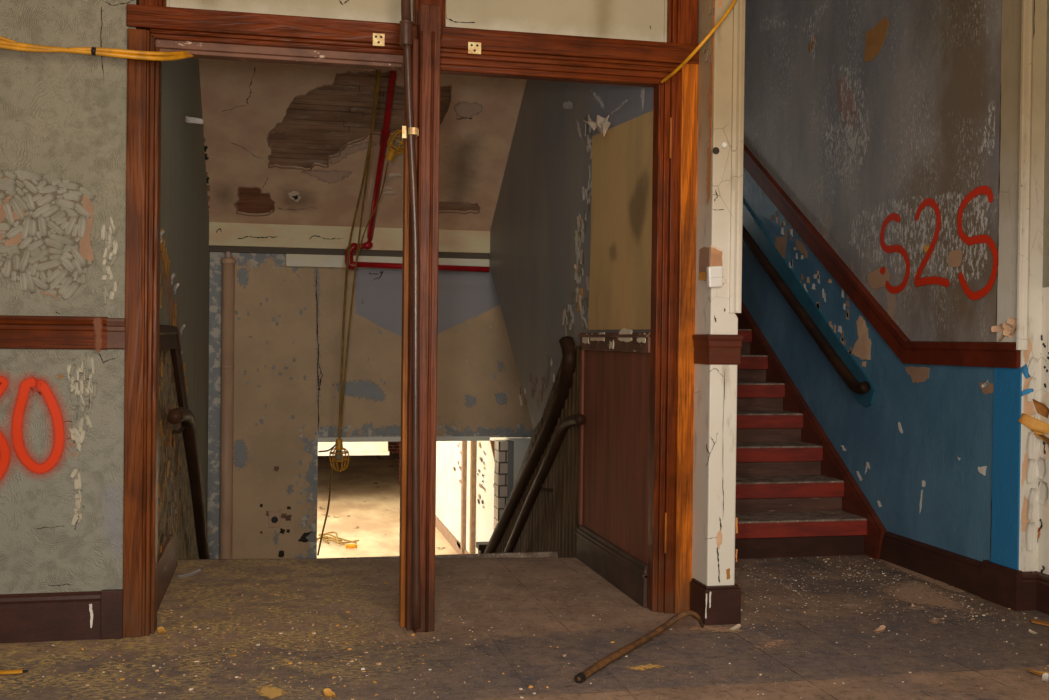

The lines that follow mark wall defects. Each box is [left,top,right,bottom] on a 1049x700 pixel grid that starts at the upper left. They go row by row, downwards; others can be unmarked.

spalling [267,71,404,171]
spalling [440,85,452,125]
peeling [703,0,721,149]
peeling [864,17,890,62]
spalling [234,186,275,217]
peeling [562,114,611,337]
peeling [771,210,871,367]
peeling [991,318,1017,341]
peeling [1018,287,1049,575]